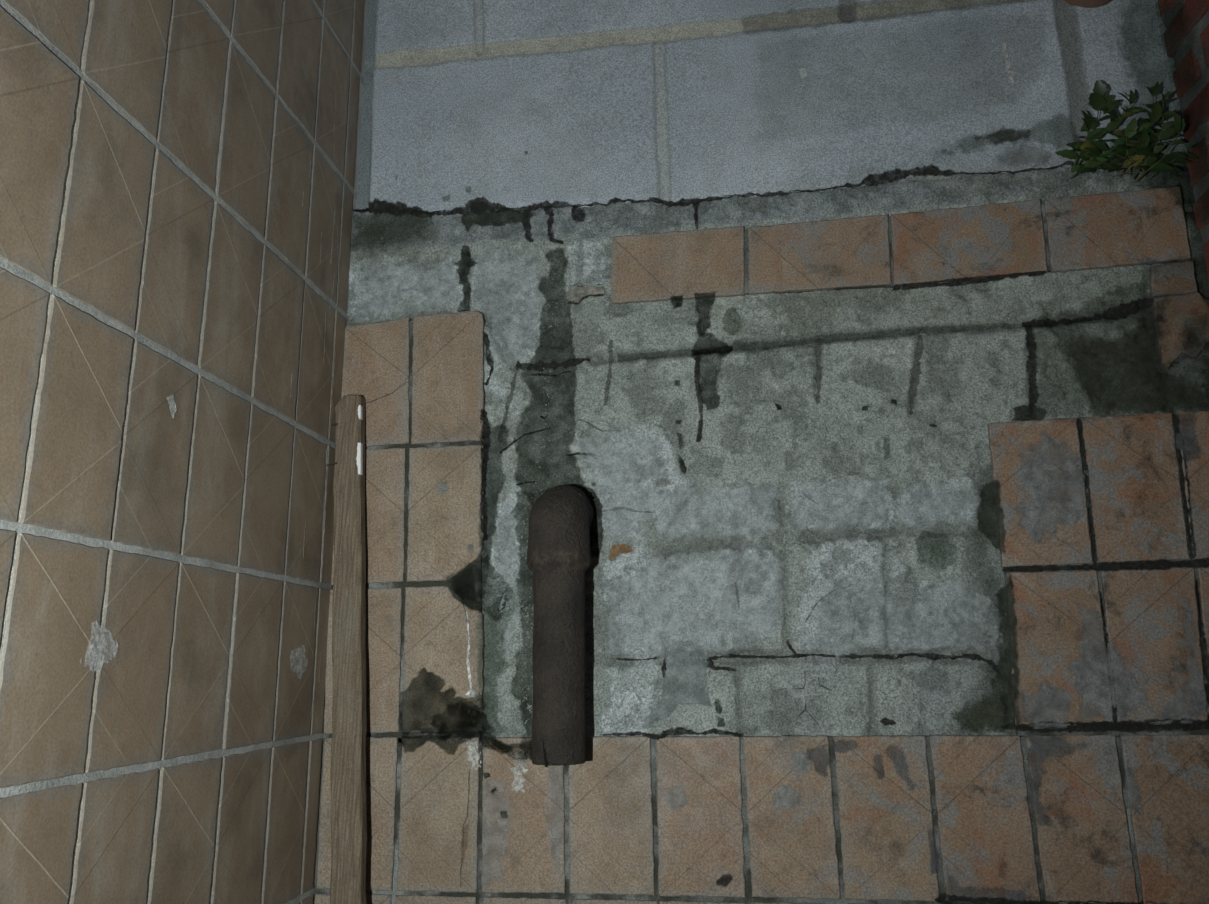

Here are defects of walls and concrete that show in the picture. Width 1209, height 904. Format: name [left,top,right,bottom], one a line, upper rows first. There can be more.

crack [353,161,1083,244]
damp [671,292,733,442]
damp [400,246,583,793]
flaking render [346,156,1209,737]
crack [706,582,1000,725]
crack [602,727,742,740]